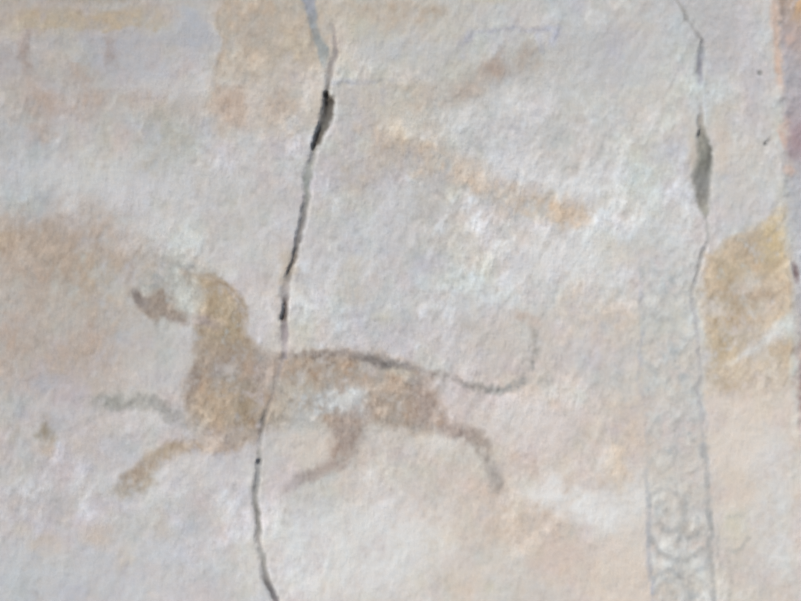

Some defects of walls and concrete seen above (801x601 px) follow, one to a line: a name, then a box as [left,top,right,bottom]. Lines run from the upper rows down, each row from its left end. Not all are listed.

crack [250,0,341,601]
crack [673,0,716,336]